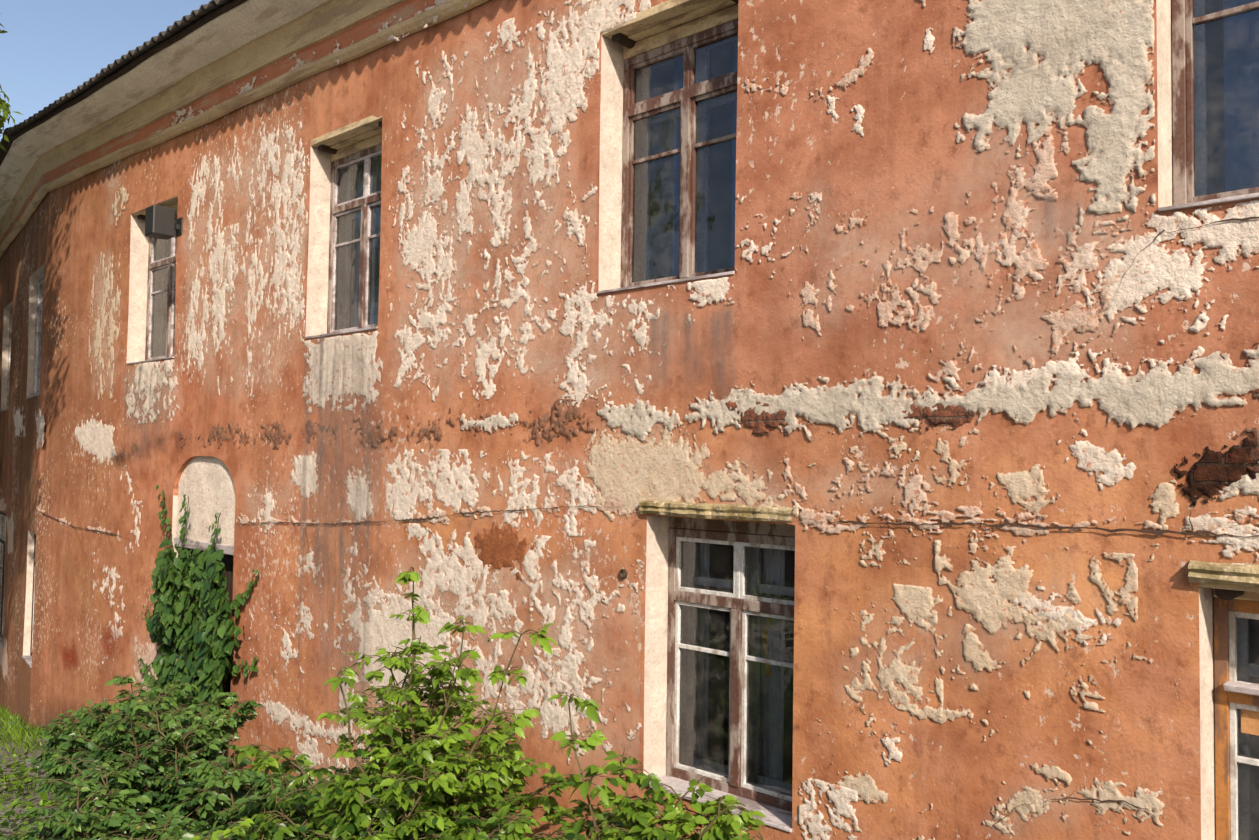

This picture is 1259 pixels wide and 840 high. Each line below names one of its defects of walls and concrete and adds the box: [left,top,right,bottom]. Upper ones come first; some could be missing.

flaking render [104,160,129,226]
flaking render [123,118,402,450]
crack [1115,217,1259,296]
flaking render [88,251,121,400]
flaking render [259,0,1259,785]
flaking render [74,413,146,664]
flaking render [241,475,282,534]
crack [236,492,627,557]
crack [799,489,1259,554]
flaking render [133,634,165,705]
flaking render [798,754,891,840]
flaking render [982,762,1166,836]